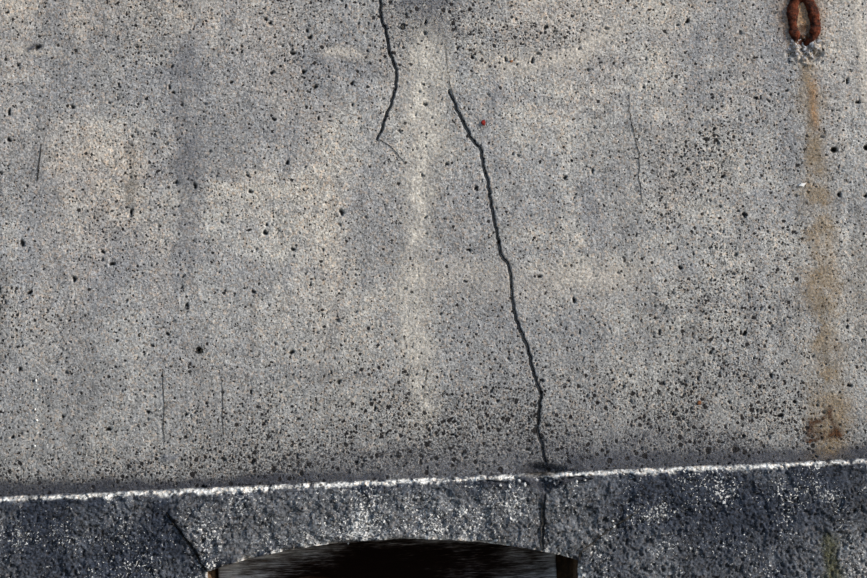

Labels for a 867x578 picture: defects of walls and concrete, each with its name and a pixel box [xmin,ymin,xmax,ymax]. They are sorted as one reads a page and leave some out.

rust [797,2,810,29]
crack [377,0,407,166]
crack [445,45,546,462]
rust [806,409,842,443]
crack [539,497,547,550]